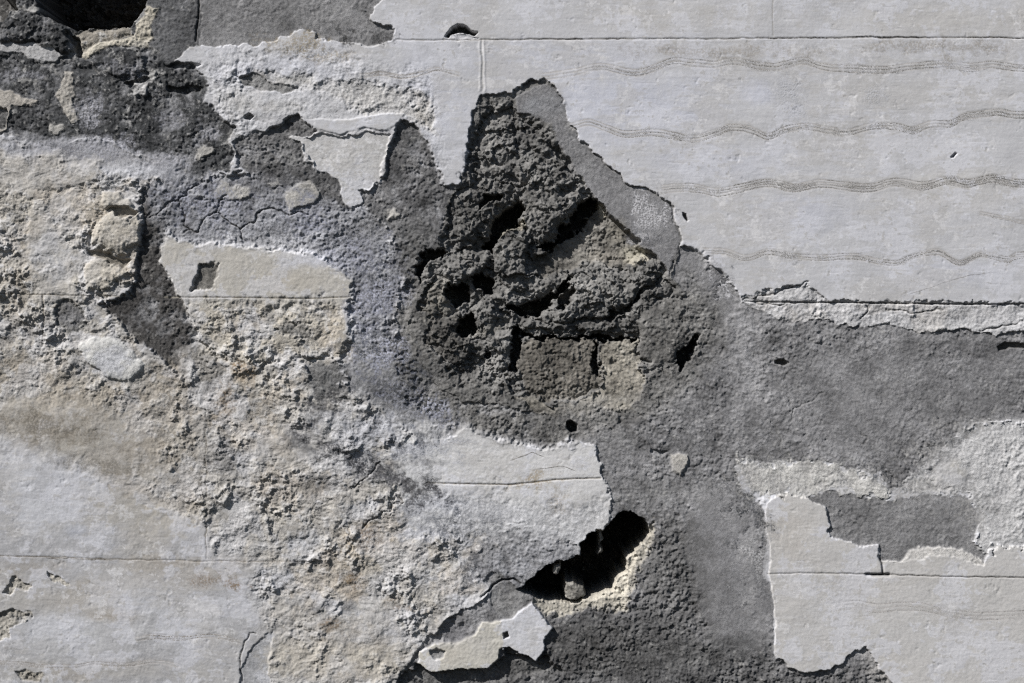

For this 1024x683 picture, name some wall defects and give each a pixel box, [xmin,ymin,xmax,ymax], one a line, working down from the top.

flaking render [0,0,517,683]
crack [147,165,408,406]
peeling [255,70,1024,683]